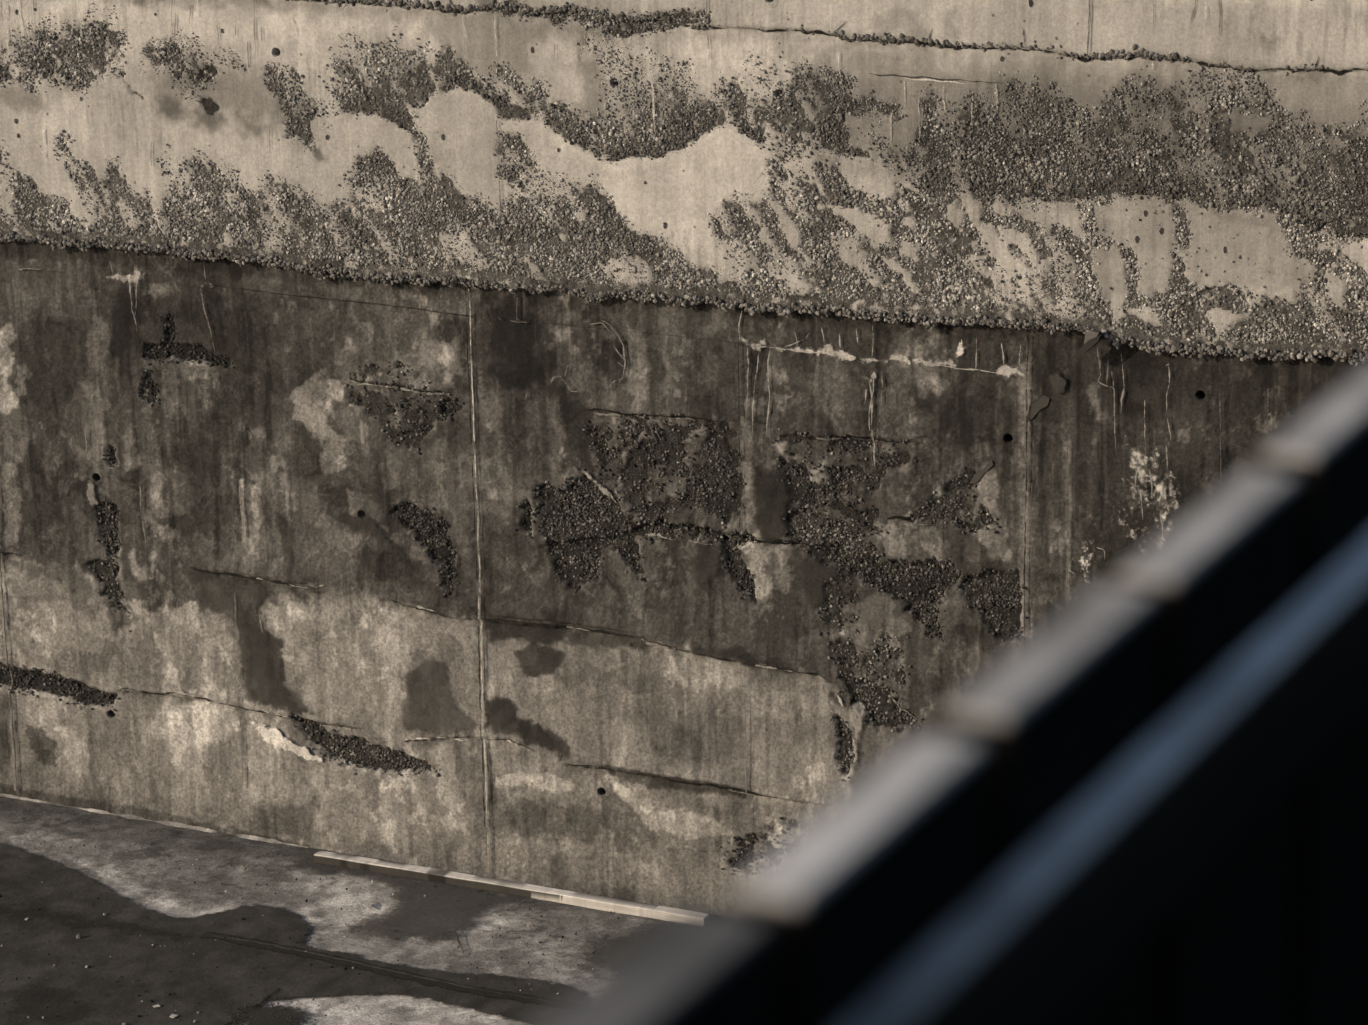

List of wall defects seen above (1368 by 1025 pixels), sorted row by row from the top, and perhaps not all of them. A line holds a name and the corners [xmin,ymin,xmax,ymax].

crack [286,0,1368,144]
spalling [0,0,1368,366]
spalling [137,314,234,411]
spalling [89,501,129,613]
spalling [515,413,760,604]
spalling [771,428,1027,781]
spalling [0,662,120,711]
crack [117,686,356,731]
spalling [287,714,440,777]
damp [400,659,568,757]
damp [0,842,579,1025]
damp [579,921,663,969]